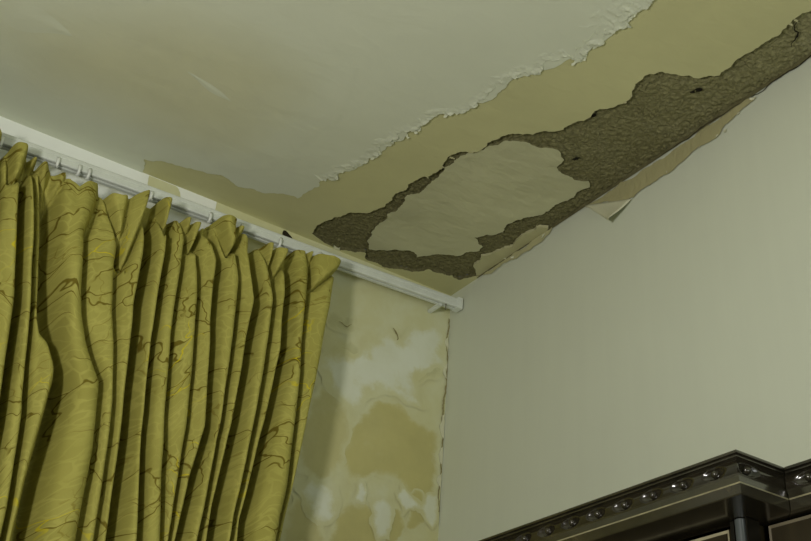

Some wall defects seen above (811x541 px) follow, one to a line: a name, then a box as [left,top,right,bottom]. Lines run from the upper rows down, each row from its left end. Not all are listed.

peeling [143,0,811,296]
crack [548,22,811,230]
damp [280,495,426,541]
damp [296,382,443,502]